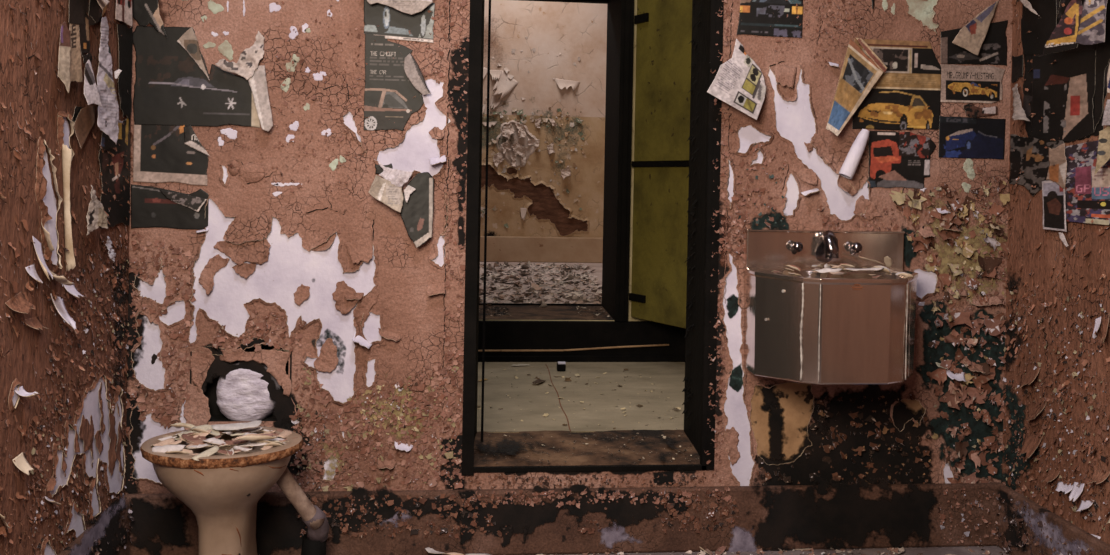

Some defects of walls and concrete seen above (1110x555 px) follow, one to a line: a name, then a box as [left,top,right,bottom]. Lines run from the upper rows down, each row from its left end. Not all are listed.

peeling [770,0,866,68]
peeling [704,63,1110,555]
leakage [321,435,696,548]